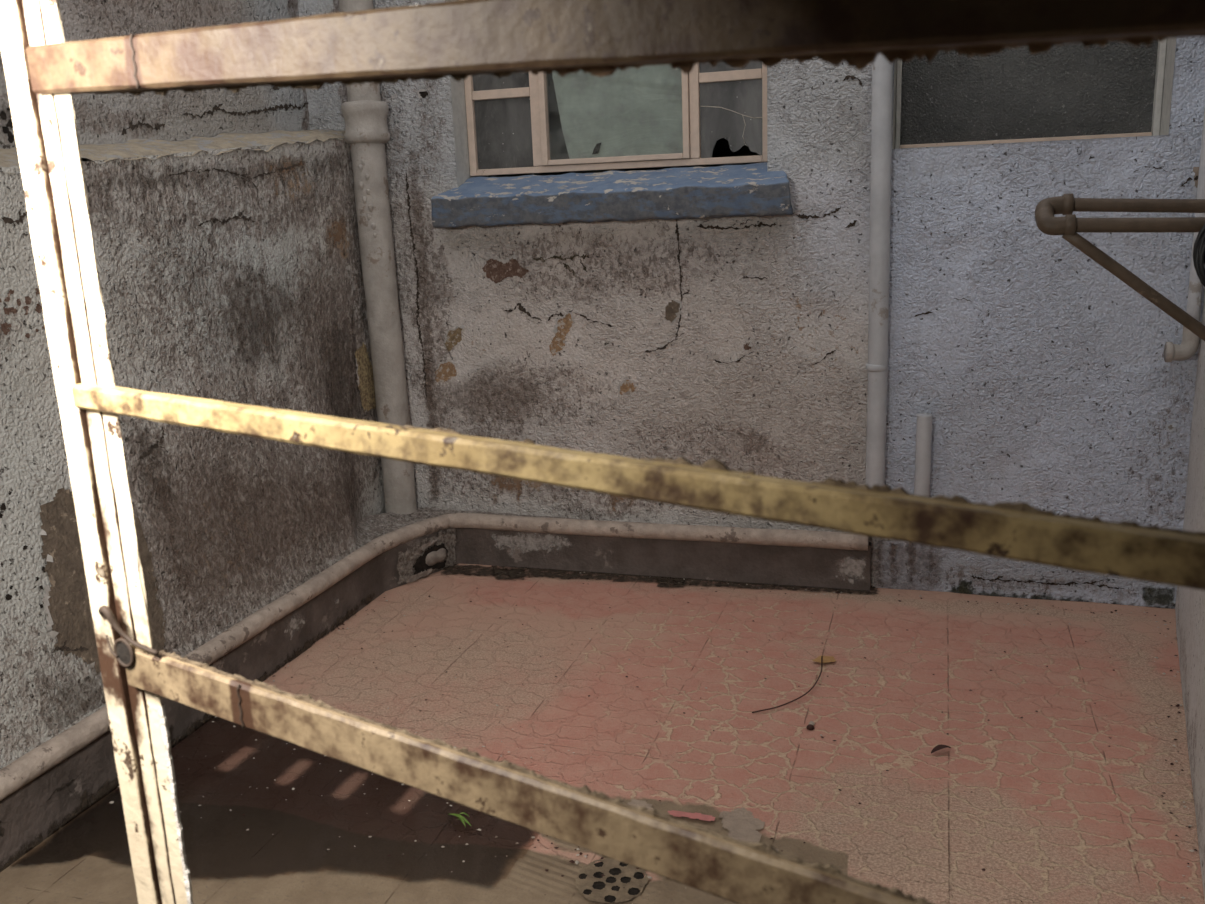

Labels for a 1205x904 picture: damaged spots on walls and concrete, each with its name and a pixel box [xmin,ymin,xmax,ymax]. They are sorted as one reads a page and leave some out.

crack [121,86,308,135]
peeling [482,255,529,283]
crack [533,254,589,277]
crack [645,206,857,353]
peeling [435,324,466,382]
crack [505,303,614,327]
peeling [549,312,575,356]
peeling [23,488,101,673]
peeling [132,507,167,653]